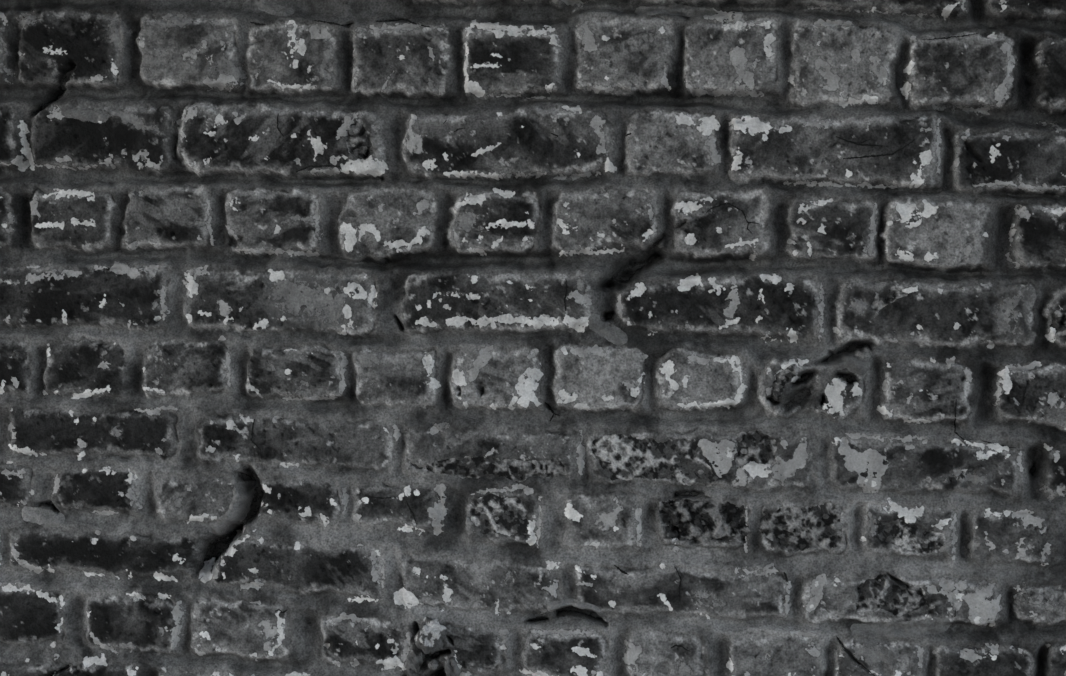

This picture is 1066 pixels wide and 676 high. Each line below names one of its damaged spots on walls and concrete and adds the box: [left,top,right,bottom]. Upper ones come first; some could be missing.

peeling [454,212,535,256]
peeling [397,275,593,332]
peeling [677,273,740,330]
peeling [757,274,794,304]
peeling [489,349,544,410]
peeling [659,353,748,410]
spalling [397,429,844,555]
spalling [832,405,958,561]
peeling [951,438,1024,472]
peeling [519,560,603,676]
spalling [856,574,1002,627]
crack [836,636,875,676]